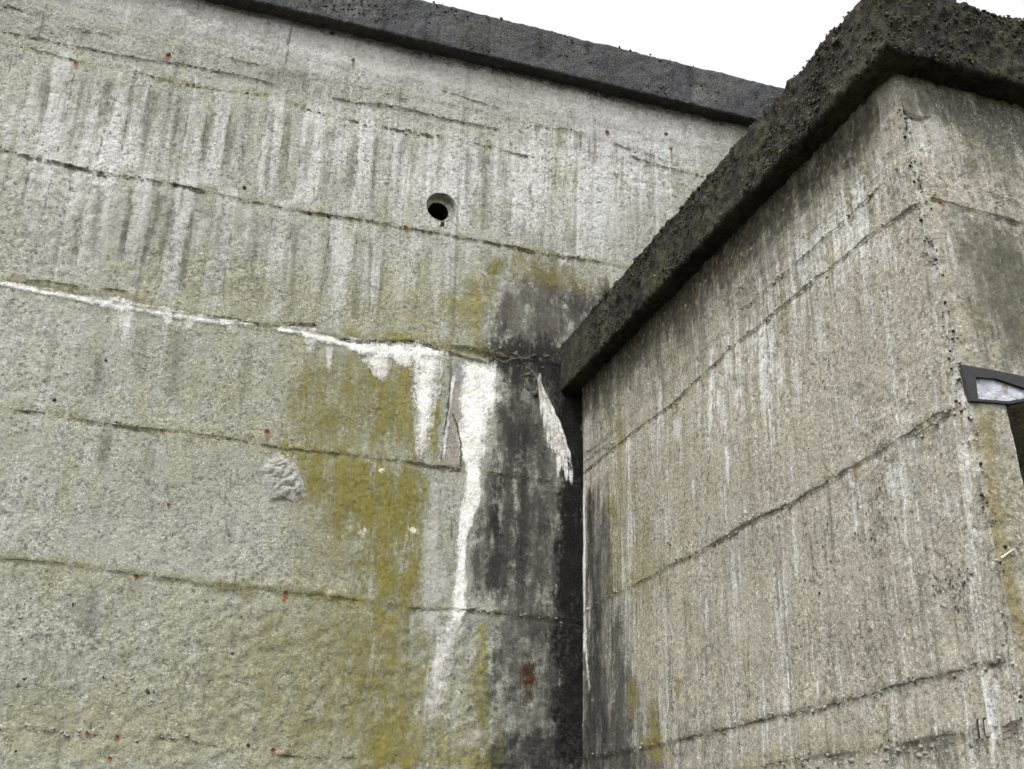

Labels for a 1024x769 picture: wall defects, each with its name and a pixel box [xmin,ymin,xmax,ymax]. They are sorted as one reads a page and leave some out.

leakage [106,0,723,145]
leakage [0,281,248,337]
leakage [277,106,878,769]
corrosion [521,662,536,703]